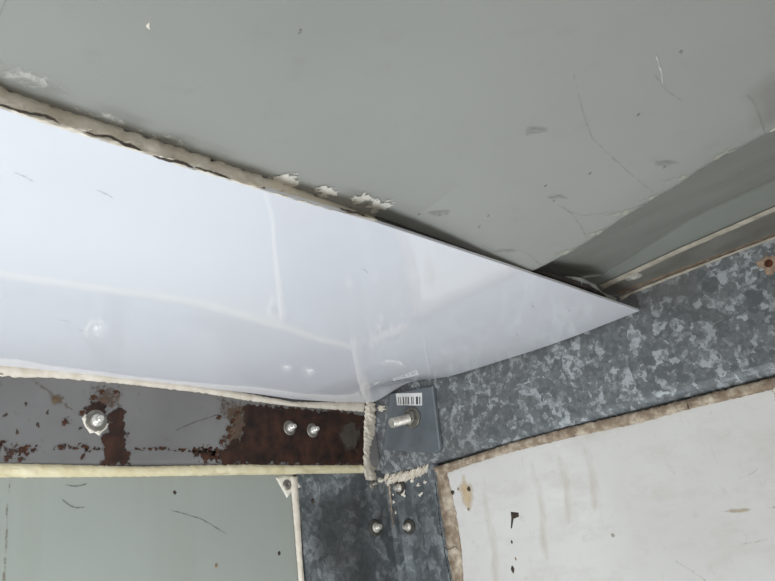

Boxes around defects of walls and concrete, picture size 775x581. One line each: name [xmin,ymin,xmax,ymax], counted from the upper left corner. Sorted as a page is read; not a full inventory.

corrosion [756,256,775,275]
corrosion [53,386,365,466]
corrosion [0,440,41,462]